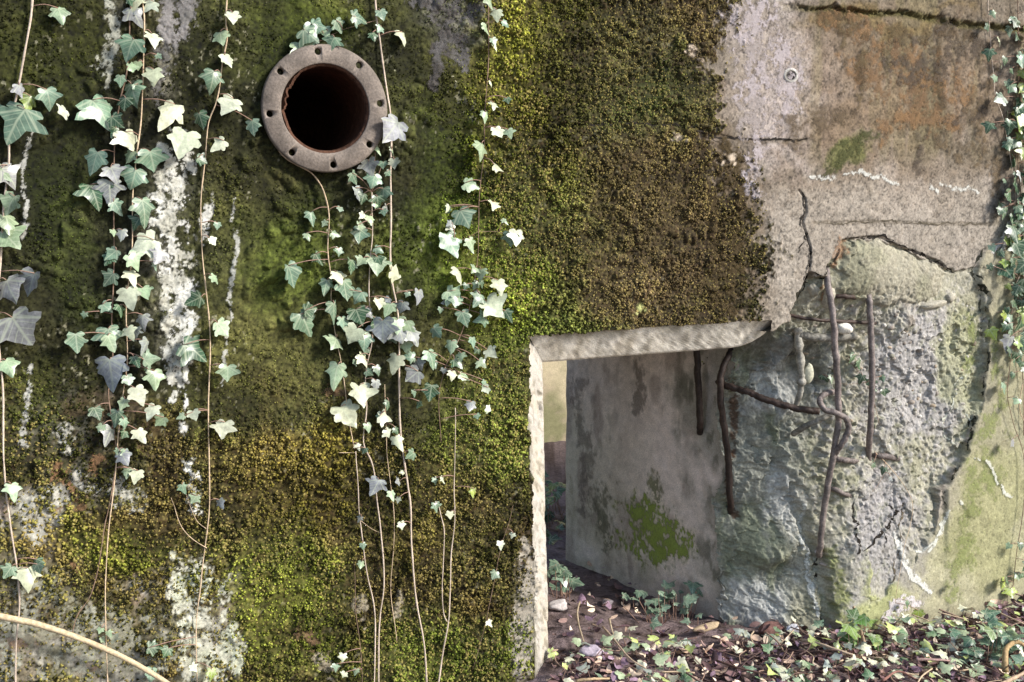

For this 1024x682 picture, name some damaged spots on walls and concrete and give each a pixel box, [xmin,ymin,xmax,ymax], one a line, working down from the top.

corrosion [281,63,369,153]
crack [556,121,807,155]
leakage [809,169,899,186]
leakage [882,16,1004,203]
leakage [149,143,214,409]
crack [797,192,994,507]
leakage [183,457,202,515]
leakage [647,477,662,504]
corrosion [728,378,738,457]
spalling [711,253,992,631]